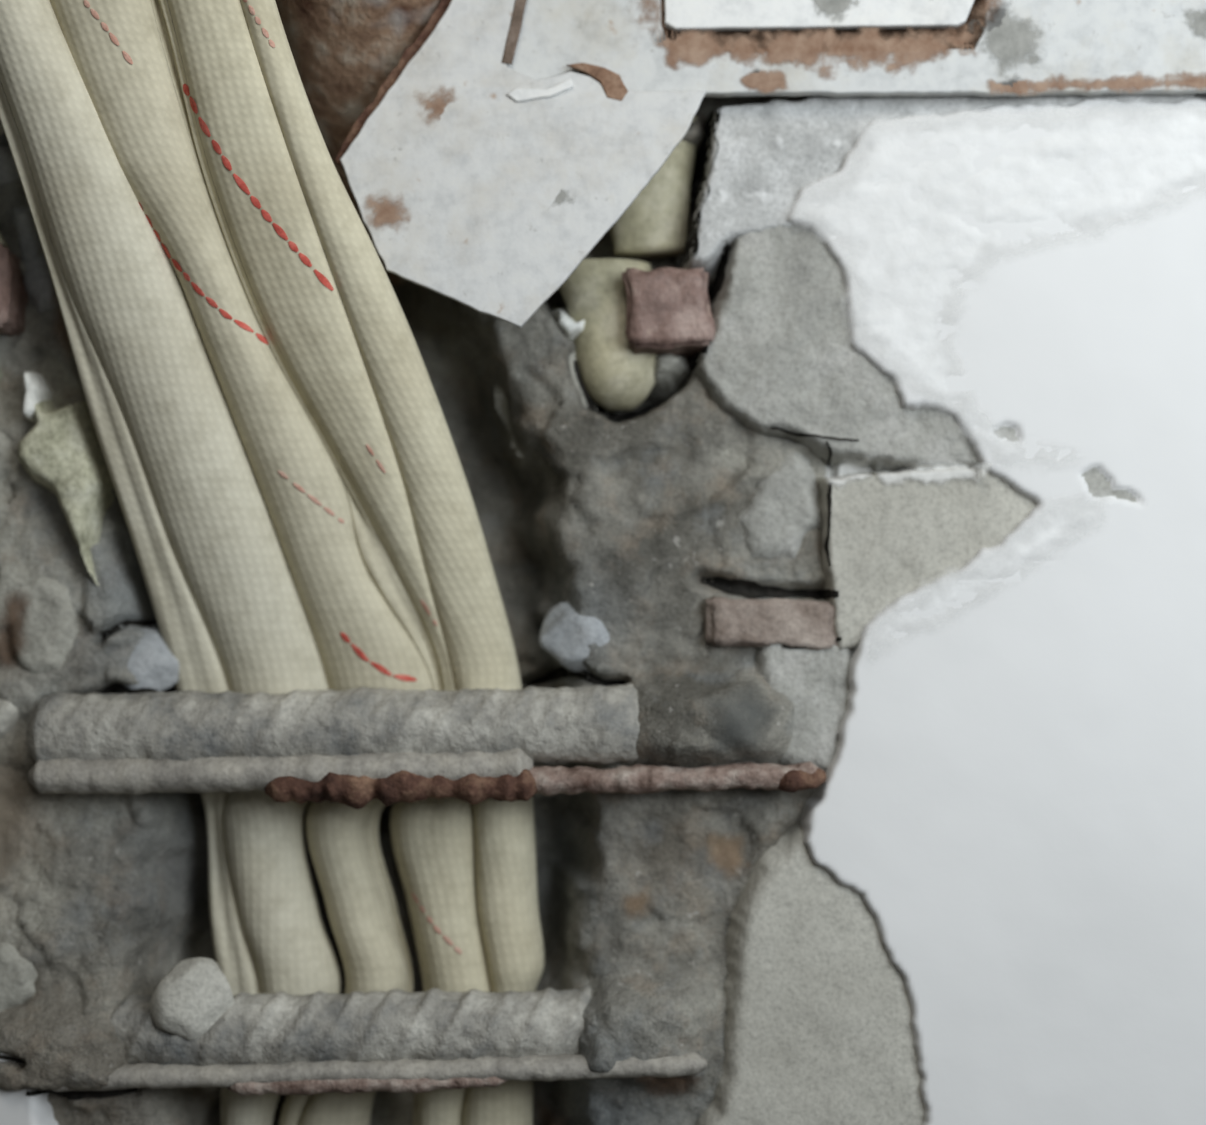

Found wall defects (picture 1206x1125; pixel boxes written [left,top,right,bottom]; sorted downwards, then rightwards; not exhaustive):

rust [334,0,453,170]
rust [640,0,997,93]
rust [989,73,1206,95]
rust [367,197,409,227]
crack [701,427,859,600]
spalling [391,93,1206,771]
spalling [0,121,235,1125]
crack [783,637,842,649]
spalling [303,801,346,994]
spalling [379,804,423,992]
spalling [533,788,925,1125]
spalling [370,1091,414,1125]